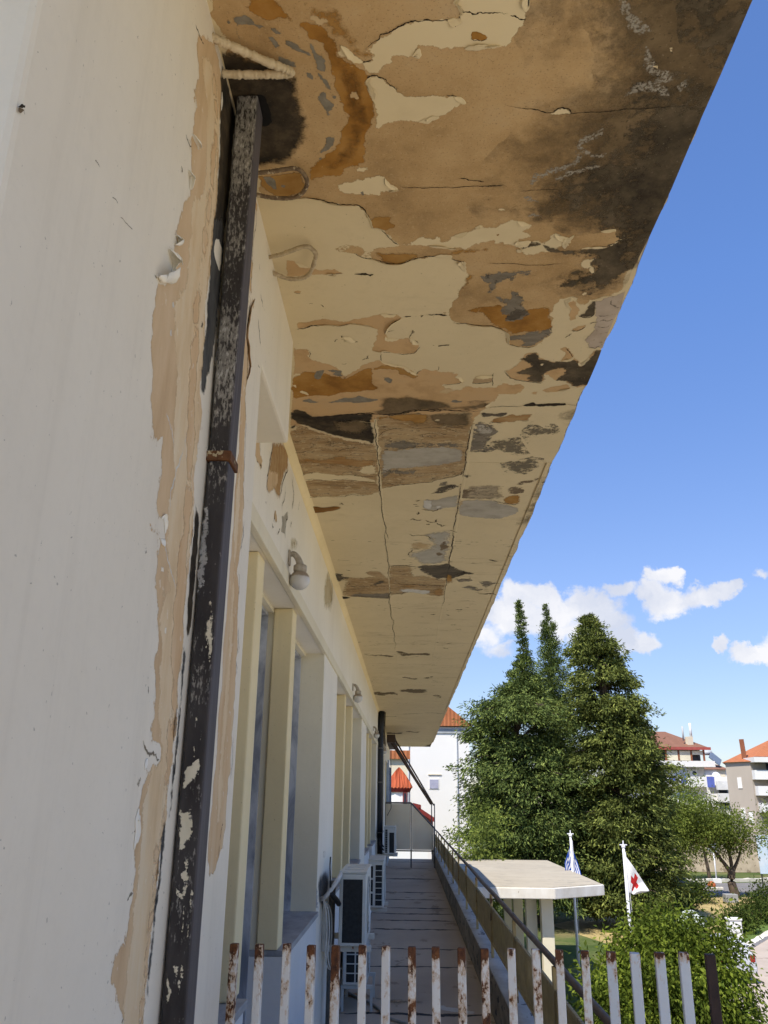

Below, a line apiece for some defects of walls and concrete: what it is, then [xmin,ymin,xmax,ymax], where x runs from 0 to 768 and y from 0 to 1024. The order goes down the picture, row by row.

damp [201,0,375,392]
crack [511,106,682,114]
damp [523,0,752,295]
damp [187,510,199,636]
peeling [111,0,658,1024]
crack [374,420,496,649]
damp [147,708,181,991]